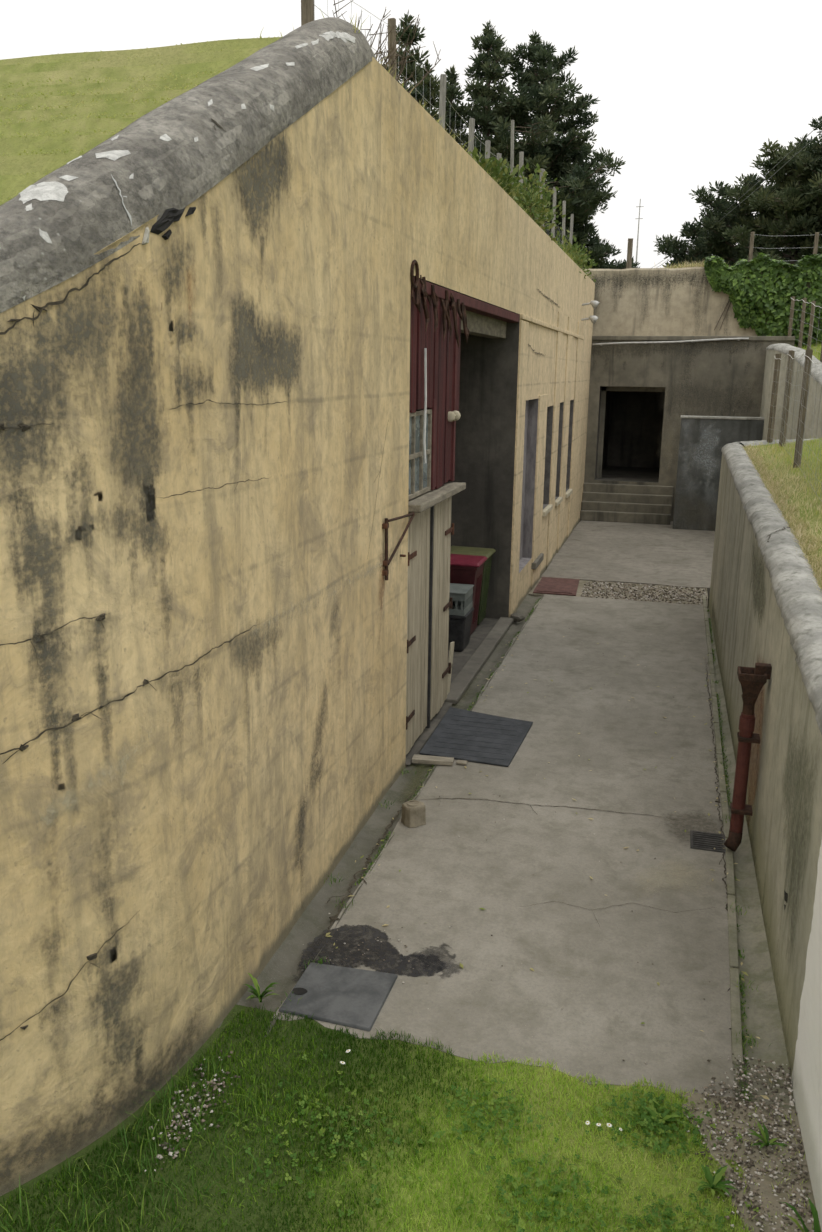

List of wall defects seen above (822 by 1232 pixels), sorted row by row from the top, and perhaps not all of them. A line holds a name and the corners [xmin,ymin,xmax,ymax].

crack [0,175,144,335]
spalling [142,207,196,245]
water stain [236,131,288,234]
water stain [0,283,161,493]
water stain [230,301,300,414]
water stain [116,510,163,550]
water stain [17,468,92,737]
crack [0,613,109,666]
crack [0,625,257,763]
crack [0,913,137,1041]
water stain [411,944,460,977]